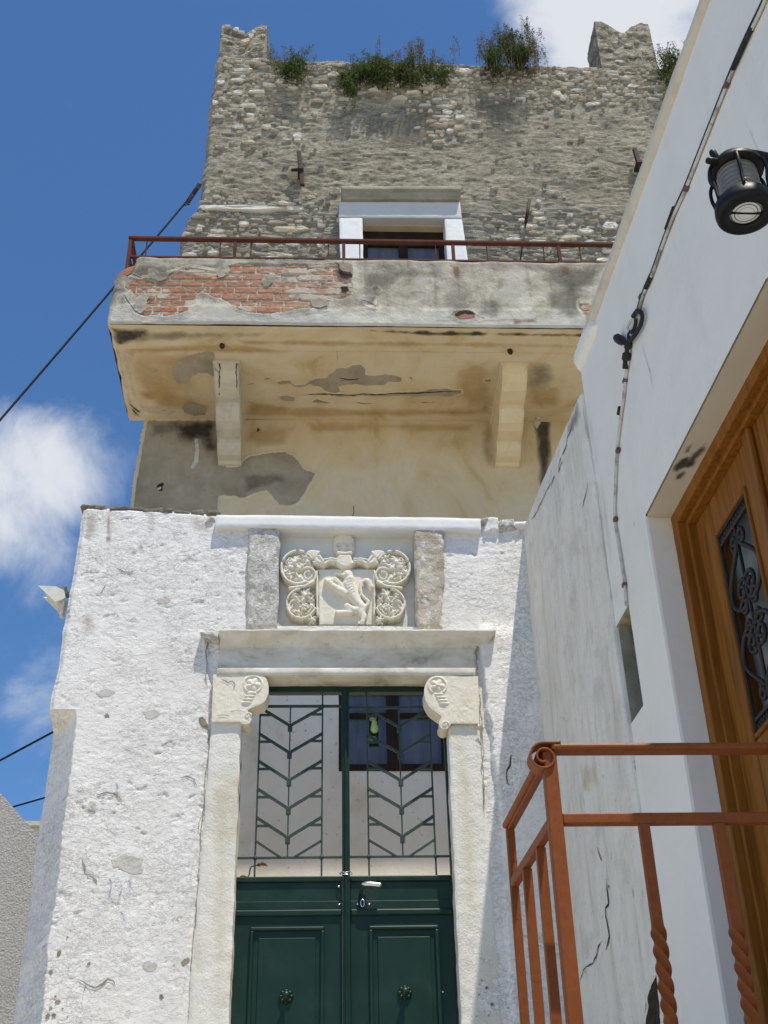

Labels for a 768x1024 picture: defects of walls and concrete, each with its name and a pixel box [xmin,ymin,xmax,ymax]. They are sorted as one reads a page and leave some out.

flaking render [114,259,384,323]
flaking render [447,308,482,323]
flaking render [172,352,215,384]
flaking render [273,362,405,404]
water stain [180,421,212,448]
flaking render [130,402,319,515]
water stain [533,417,550,481]
crack [475,646,513,818]
crack [580,848,610,979]